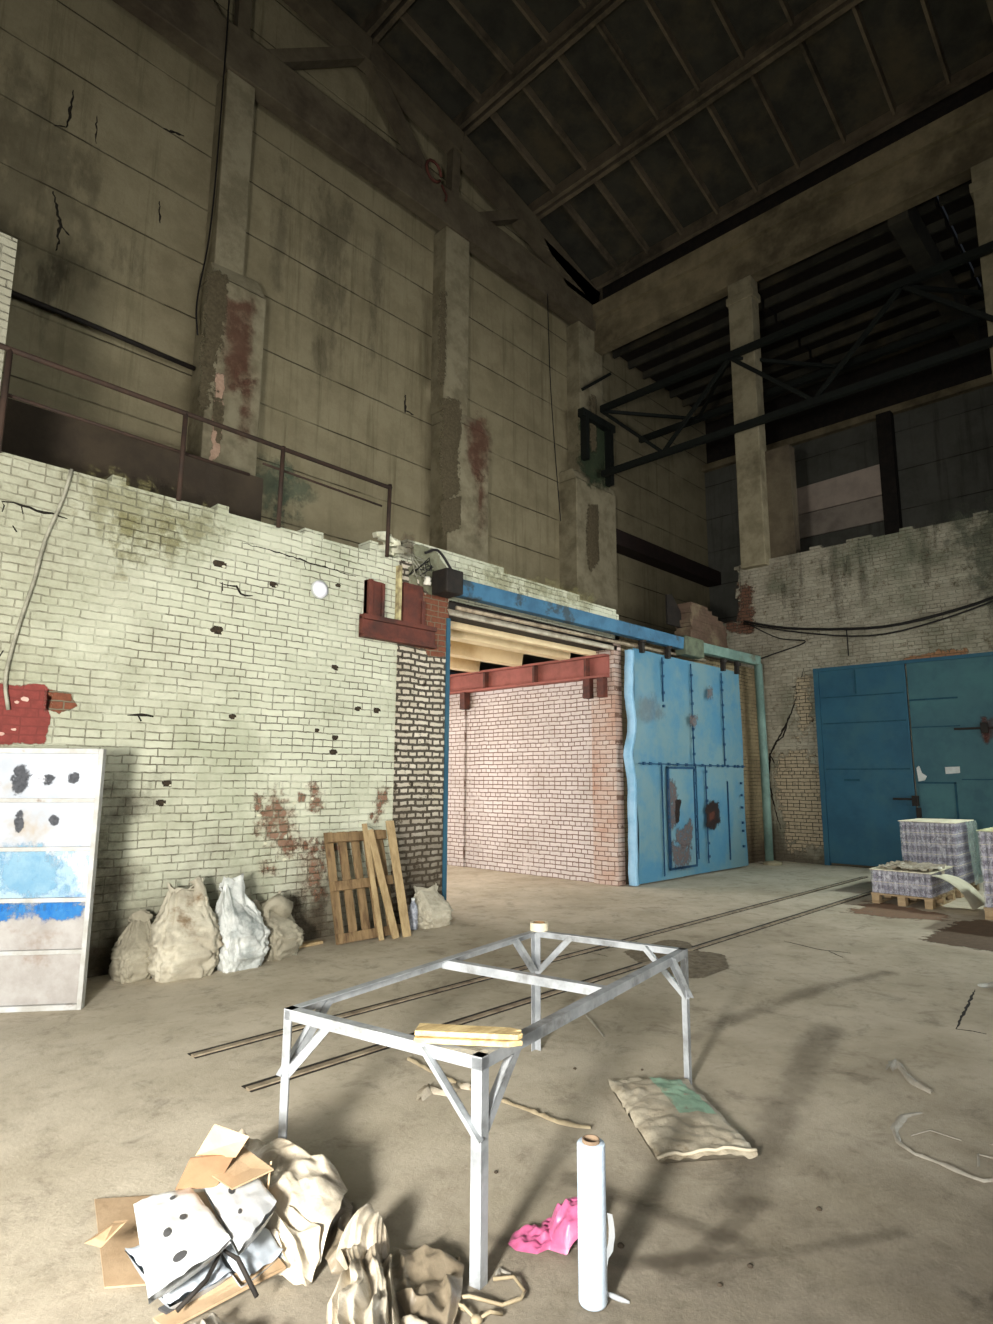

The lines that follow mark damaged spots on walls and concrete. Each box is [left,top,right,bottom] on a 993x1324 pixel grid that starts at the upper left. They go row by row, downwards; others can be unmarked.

crack [54,90,98,144]
crack [52,191,69,251]
spalling [197,268,229,461]
crack [2,501,67,532]
peeling [0,683,77,745]
flaking render [254,782,339,901]
flaking render [370,787,388,823]
rust [668,780,693,868]
crack [956,990,985,1034]